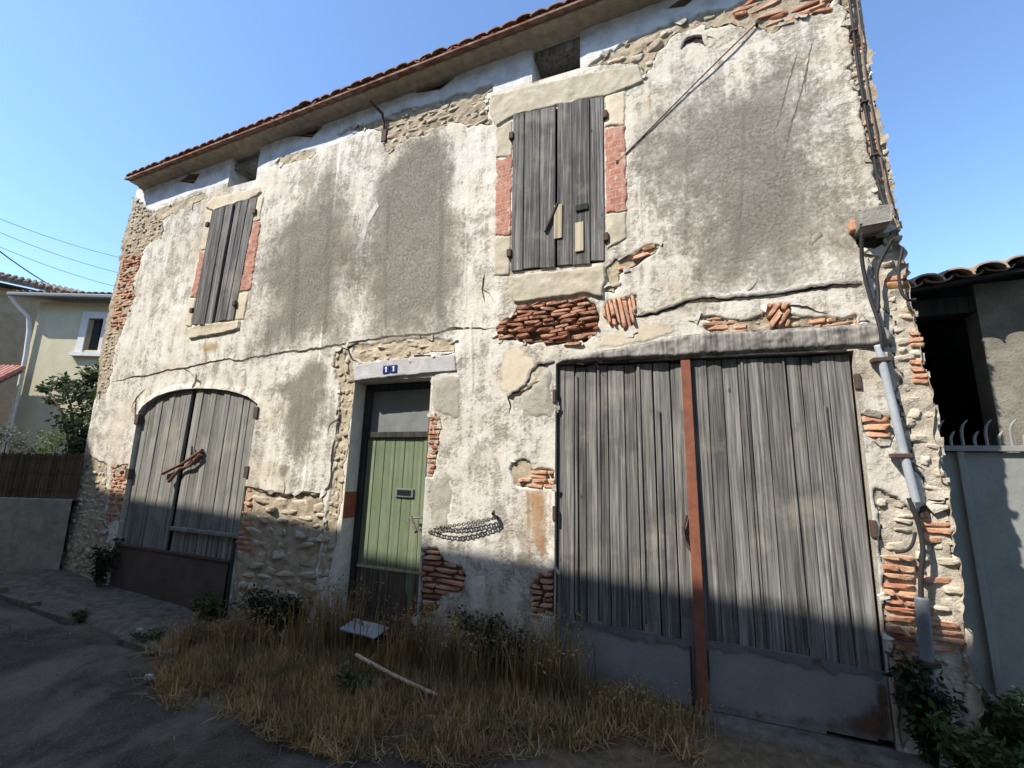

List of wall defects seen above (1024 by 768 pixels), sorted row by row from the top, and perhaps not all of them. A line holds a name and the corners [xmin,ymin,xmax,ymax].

flaking render [343,86,493,154]
flaking render [96,193,208,399]
leakage [247,132,466,357]
flaking render [491,242,663,346]
crack [630,278,862,319]
flaking render [61,451,128,581]
crack [112,327,489,496]
flaking render [228,334,466,633]
flaking render [511,460,557,492]
corrosion [527,493,544,547]
flaking render [590,0,968,755]
flaking render [526,567,560,619]